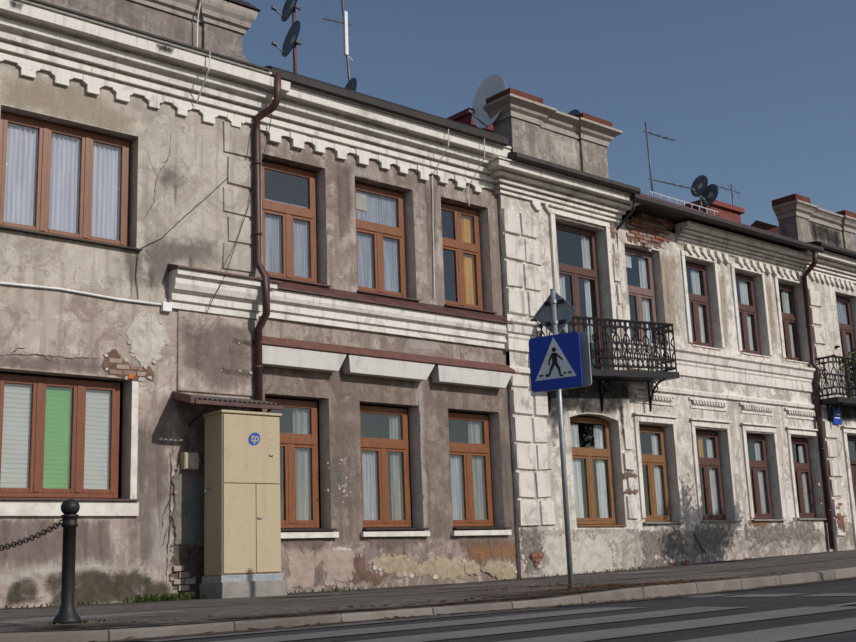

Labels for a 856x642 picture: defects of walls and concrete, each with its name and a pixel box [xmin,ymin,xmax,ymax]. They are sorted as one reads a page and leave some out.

flaking render [603,213,675,251]
peeling [102,310,170,382]
leakage [0,521,63,595]
leakage [75,522,122,595]
flaking render [168,543,204,597]
flaking render [285,546,470,591]